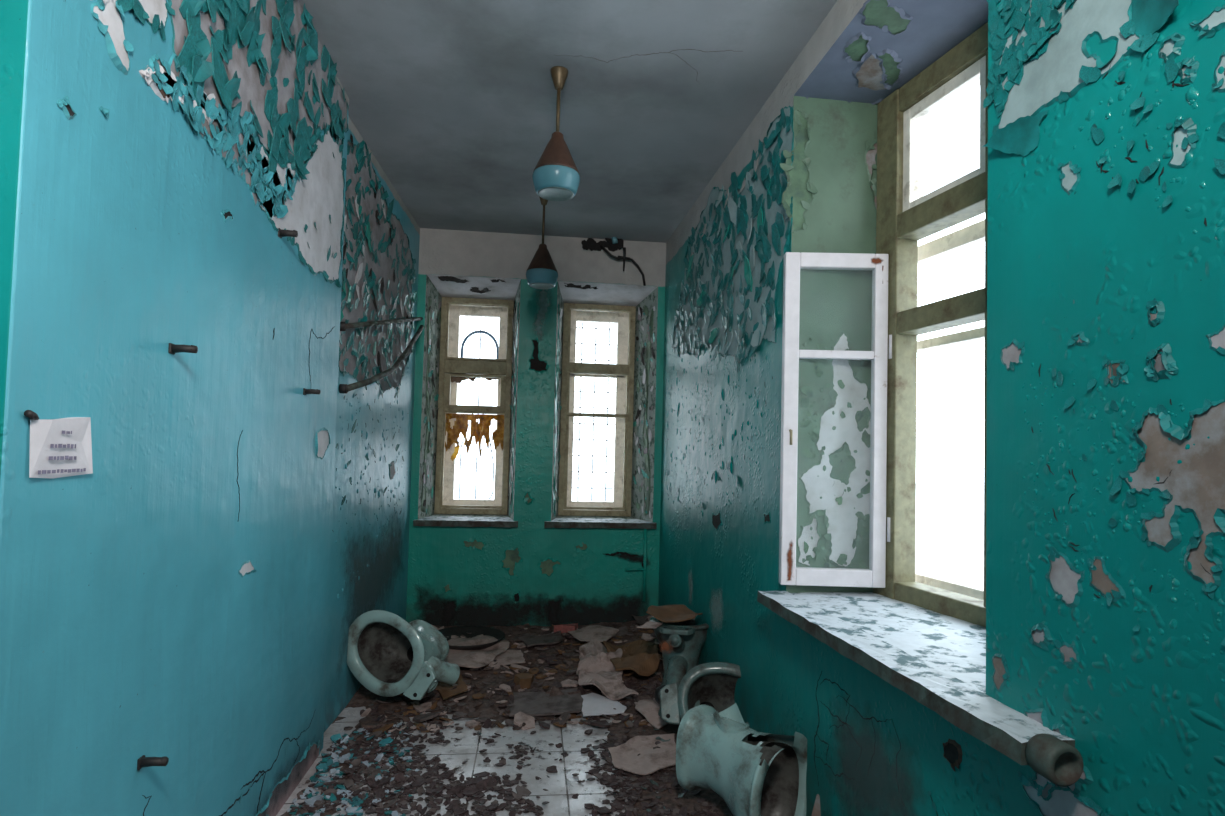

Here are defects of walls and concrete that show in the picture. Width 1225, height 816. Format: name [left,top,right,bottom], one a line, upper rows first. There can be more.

peeling [843,0,914,91]
peeling [57,95,77,120]
peeling [90,0,441,515]
peeling [437,275,507,294]
peeling [633,105,818,518]
peeling [1144,343,1179,381]
peeling [1206,324,1225,355]
peeling [797,332,871,568]
peeling [1119,398,1225,599]
water stain [419,592,652,668]
crack [219,712,315,816]
peeling [1018,766,1114,816]